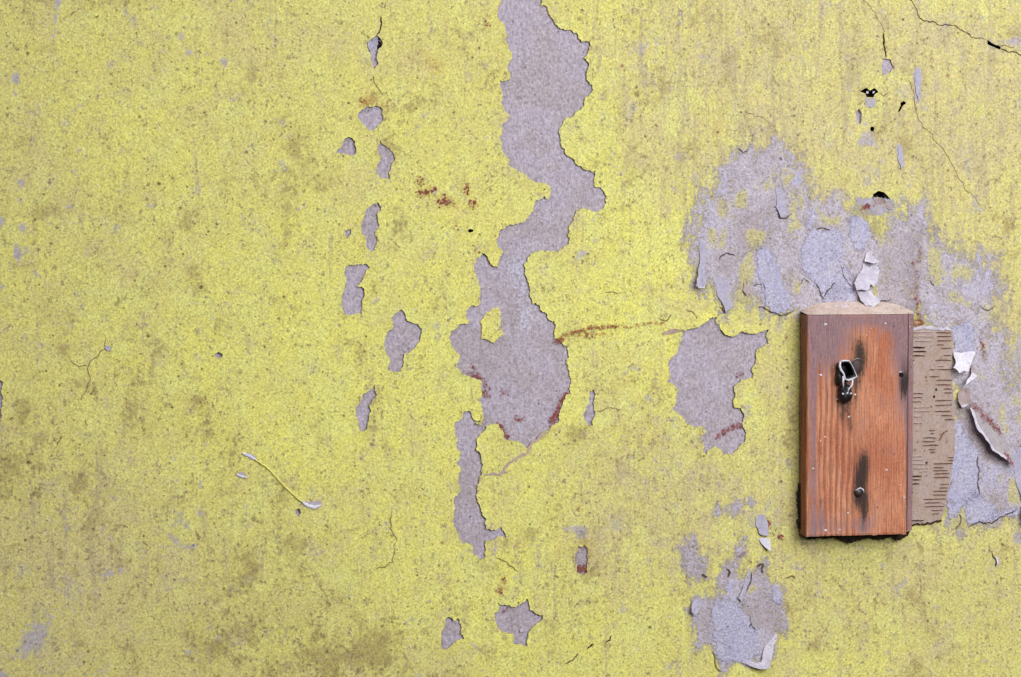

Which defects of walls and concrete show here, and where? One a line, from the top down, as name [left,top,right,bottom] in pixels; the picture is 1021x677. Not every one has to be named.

peeling [367,36,383,69]
crack [863,0,887,57]
crack [910,0,1021,56]
crack [908,80,981,205]
peeling [345,202,381,252]
peeling [342,264,370,315]
peeling [449,0,606,560]
peeling [384,310,422,372]
rust [554,321,665,343]
peeling [662,128,1021,542]
peeling [675,496,795,677]
peeling [494,599,543,646]